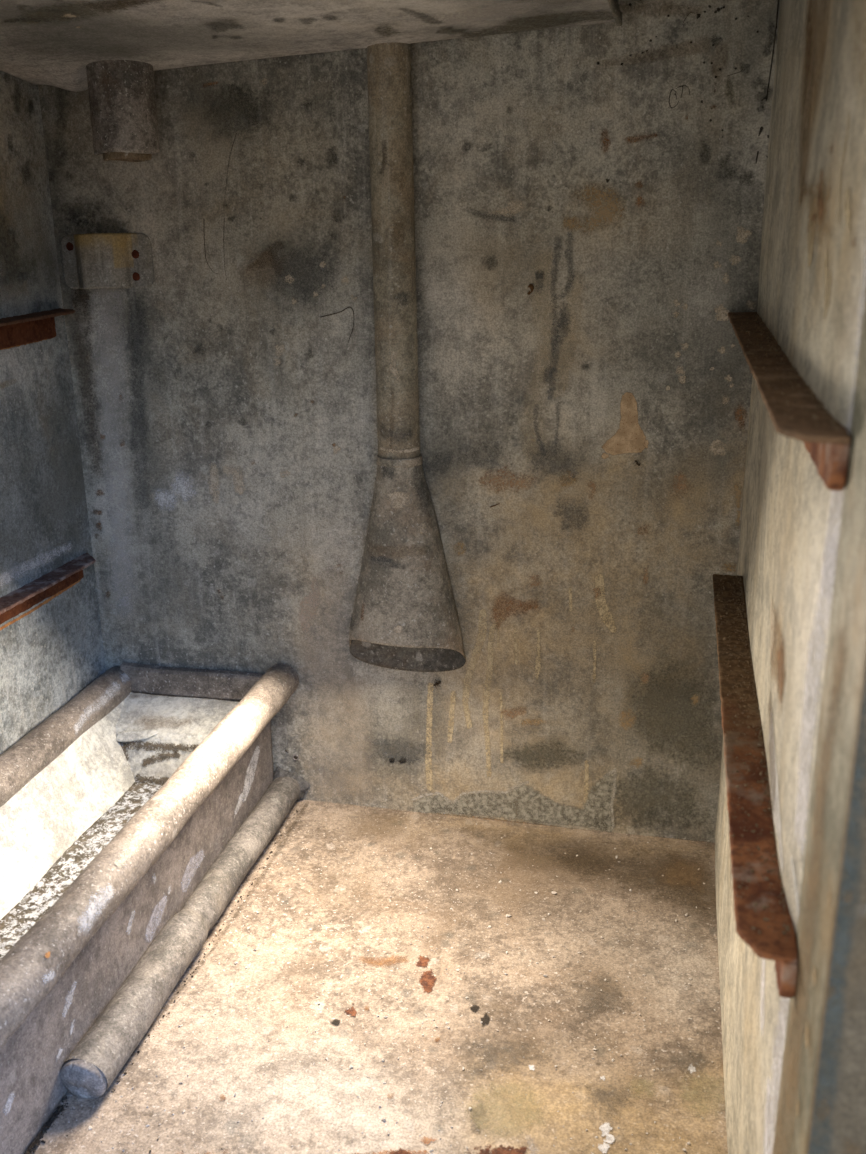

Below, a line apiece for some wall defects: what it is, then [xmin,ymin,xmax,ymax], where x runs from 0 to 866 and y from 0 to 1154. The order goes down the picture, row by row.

leakage [374,594,718,840]
corrosion [360,956,437,993]
corrosion [331,1003,370,1025]
corrosion [470,1005,490,1026]
corrosion [373,1137,435,1154]
corrosion [469,1145,528,1154]